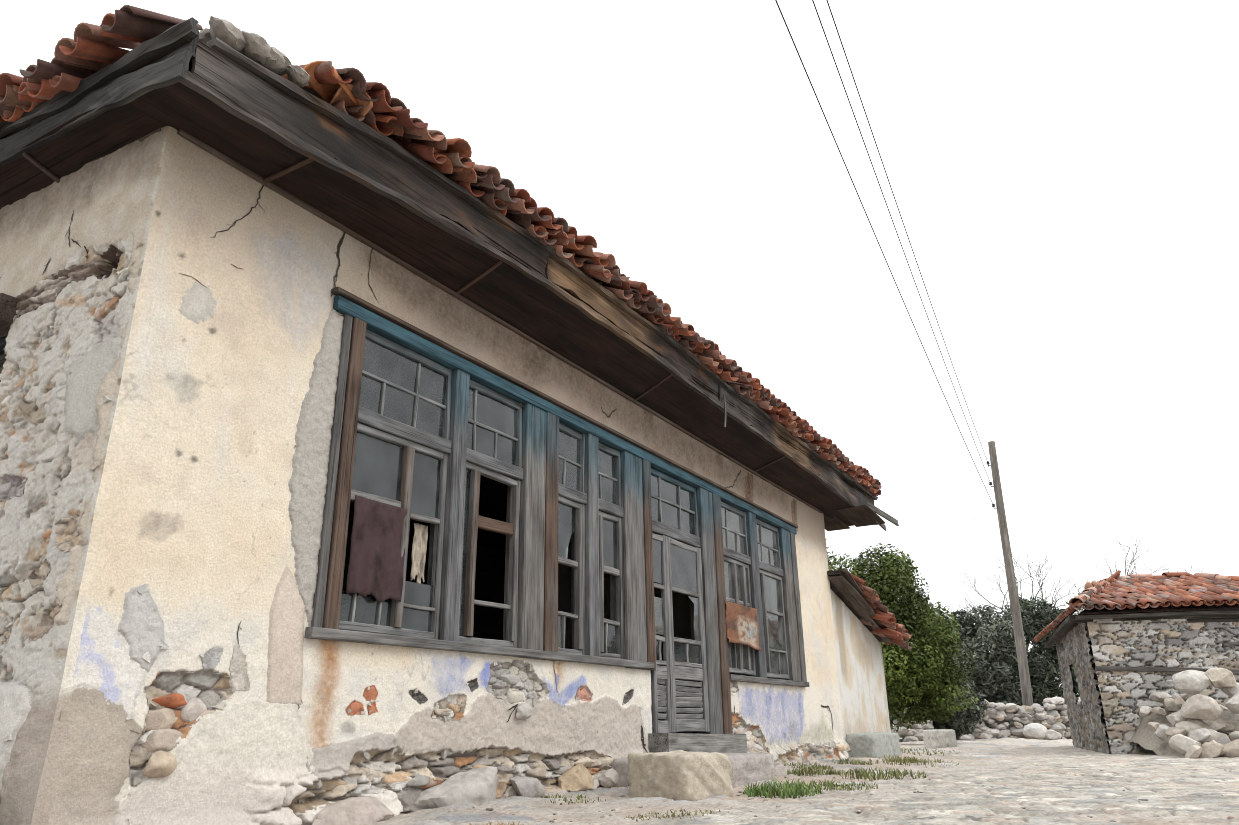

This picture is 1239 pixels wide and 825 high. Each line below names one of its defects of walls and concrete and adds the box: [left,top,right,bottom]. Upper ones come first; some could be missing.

crack [43,210,88,273]
crack [215,185,266,236]
spalling [13,228,145,321]
spalling [0,474,28,502]
spalling [27,320,250,787]
spalling [346,685,378,716]
spalling [409,659,550,721]
spalling [575,685,593,702]
flaking render [0,681,31,789]